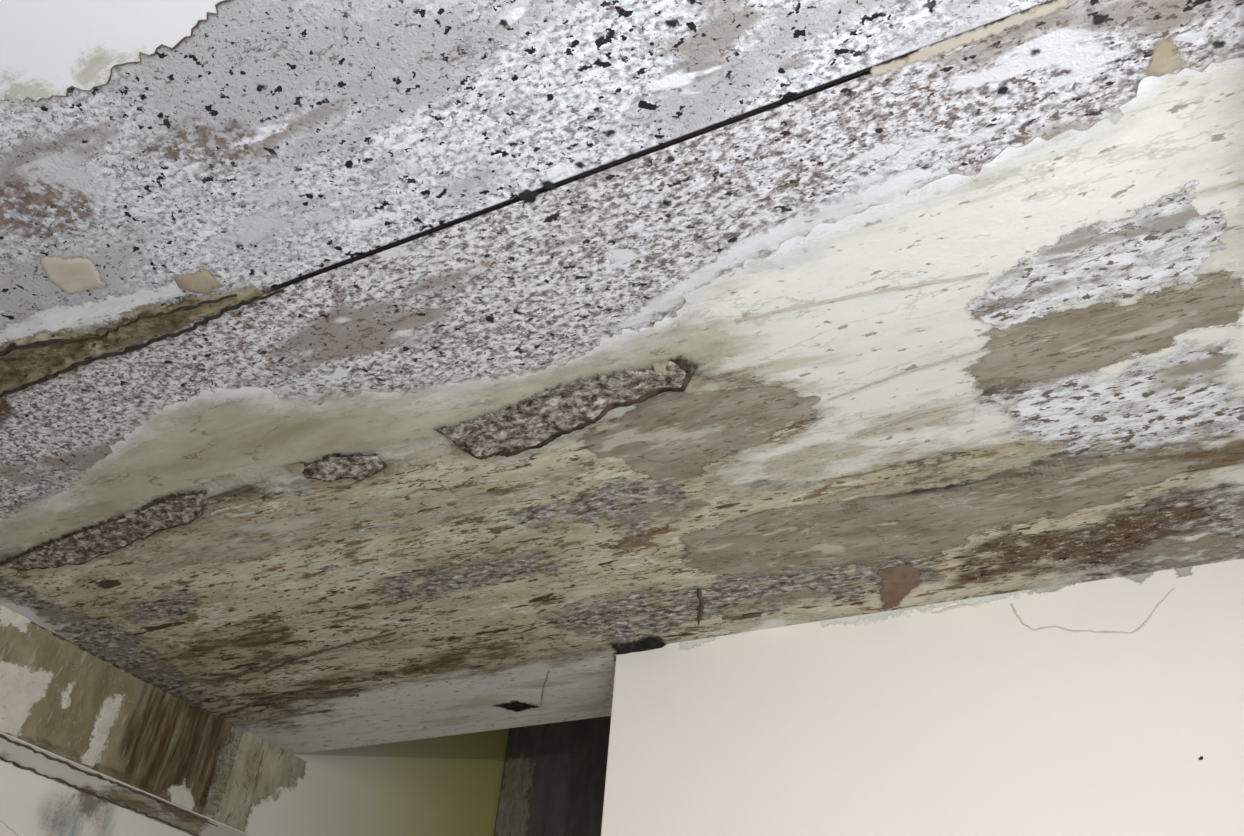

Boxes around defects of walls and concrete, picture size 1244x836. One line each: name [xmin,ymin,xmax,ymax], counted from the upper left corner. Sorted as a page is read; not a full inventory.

crack [262,0,1057,292]
peeling [0,0,1244,536]
crack [736,272,989,321]
damp [0,69,1244,717]
crack [829,348,988,401]
spalling [0,574,205,709]
damp [0,605,233,814]
crack [207,486,252,500]
damp [221,649,616,754]
spalling [377,551,563,604]
peeling [539,443,1244,661]
damp [79,785,207,836]